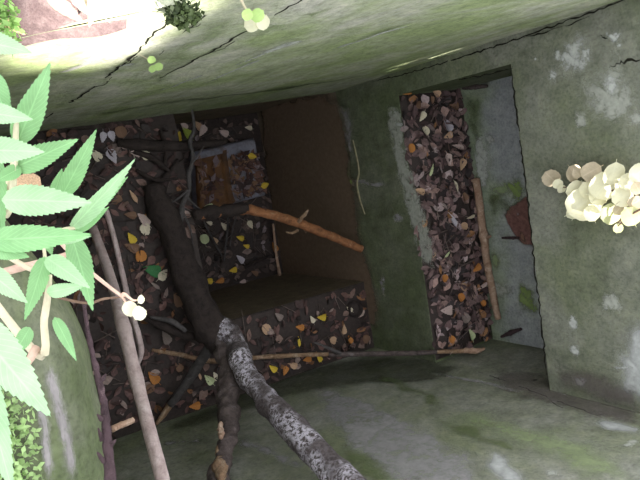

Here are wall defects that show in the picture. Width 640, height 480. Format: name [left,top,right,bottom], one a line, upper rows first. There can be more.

crack [69,24,167,103]
crack [161,31,247,78]
crack [374,0,623,82]
crack [610,58,640,67]